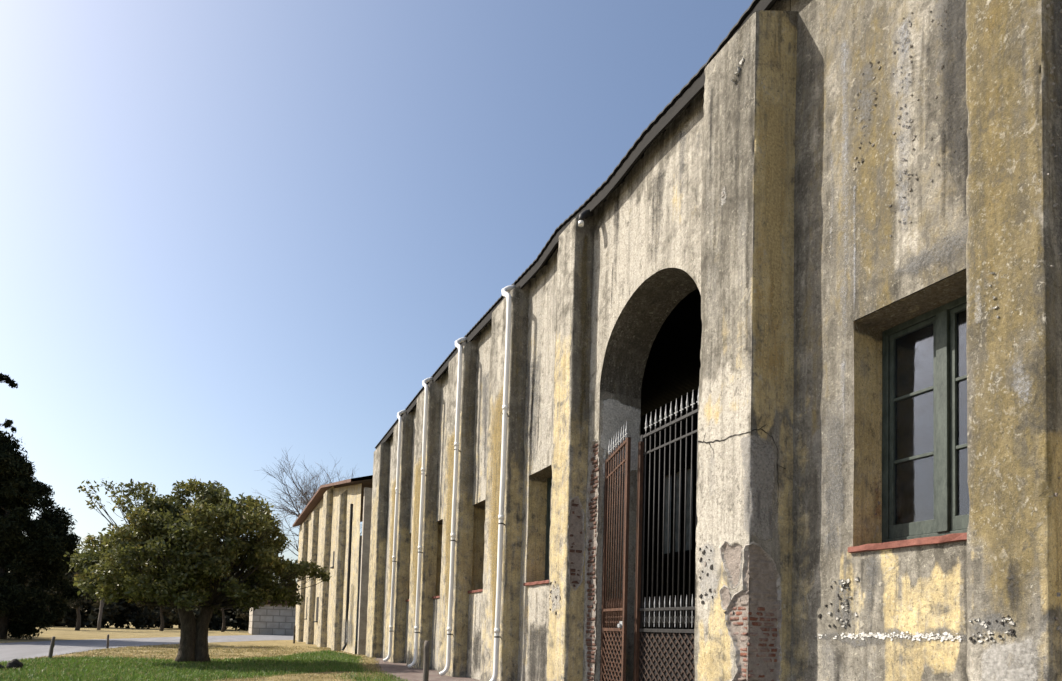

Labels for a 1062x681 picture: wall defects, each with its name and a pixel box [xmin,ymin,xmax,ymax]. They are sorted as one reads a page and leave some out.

damp [941,0,968,211]
spalling [549,440,600,681]
spalling [699,541,783,681]
crack [698,425,786,513]